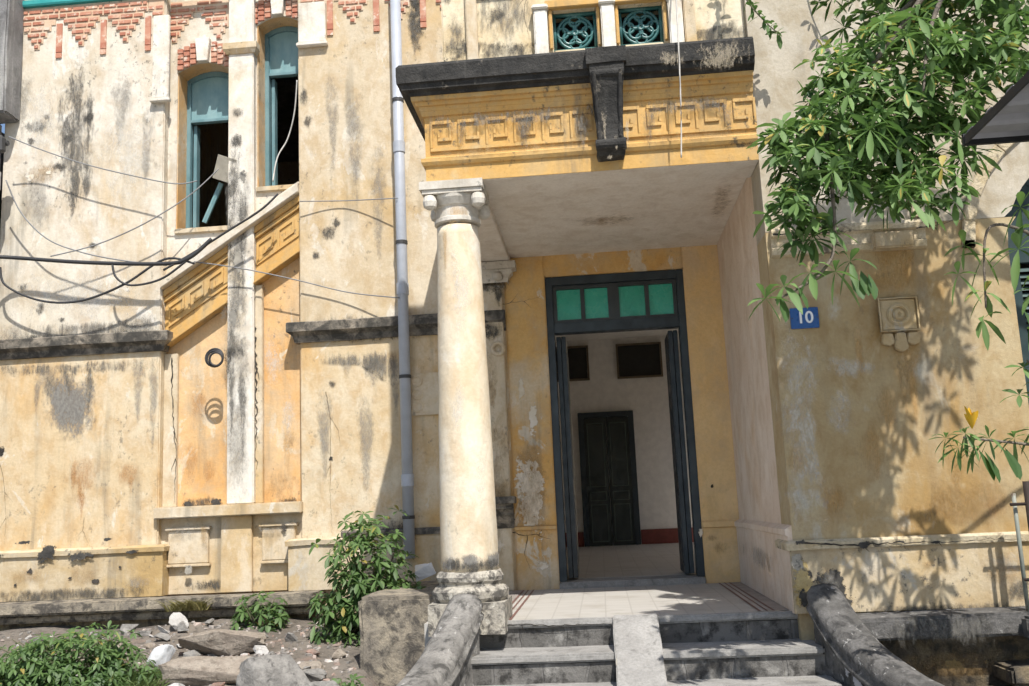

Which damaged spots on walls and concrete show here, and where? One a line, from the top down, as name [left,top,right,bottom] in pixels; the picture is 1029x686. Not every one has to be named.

water stain [26,77,93,212]
water stain [27,361,124,393]
crack [170,358,178,502]
water stain [225,326,246,460]
water stain [329,352,396,380]
peeling [514,452,545,540]
spalling [791,539,813,611]